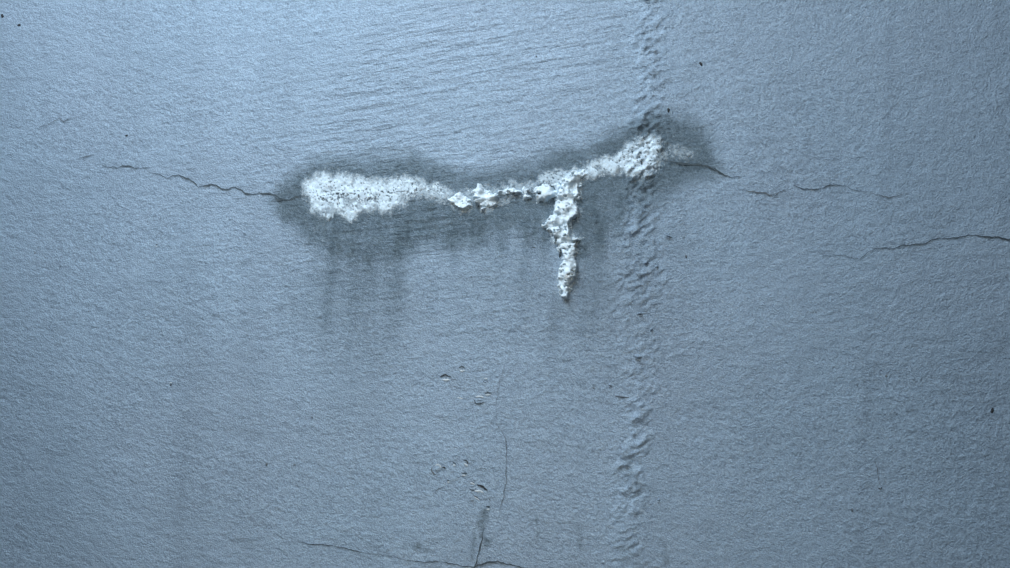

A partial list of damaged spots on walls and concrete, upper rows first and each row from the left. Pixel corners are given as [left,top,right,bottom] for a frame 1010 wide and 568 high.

crack [78,155,390,201]
crack [663,160,900,198]
water stain [302,136,662,300]
crack [823,235,1010,259]
crack [227,529,524,568]